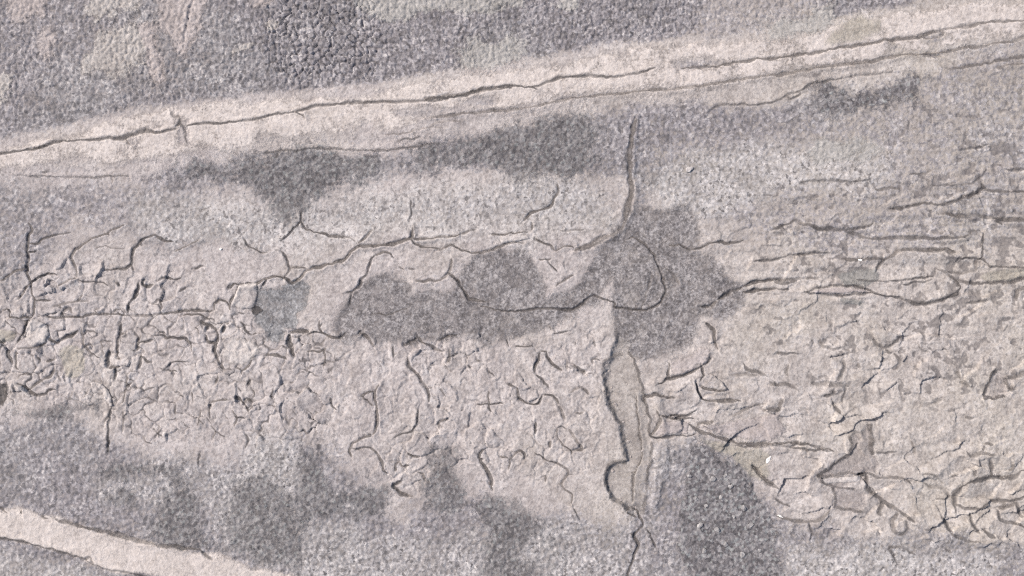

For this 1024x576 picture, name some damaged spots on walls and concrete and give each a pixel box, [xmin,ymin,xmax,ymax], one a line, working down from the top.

crack [681,20,1021,86]
crack [268,100,383,117]
crack [429,68,660,115]
crack [846,170,1024,306]
leakage [252,281,311,342]
leakage [330,205,747,361]
crack [0,119,833,576]
leakage [705,442,769,480]
crack [859,452,914,522]
crack [945,442,1024,538]